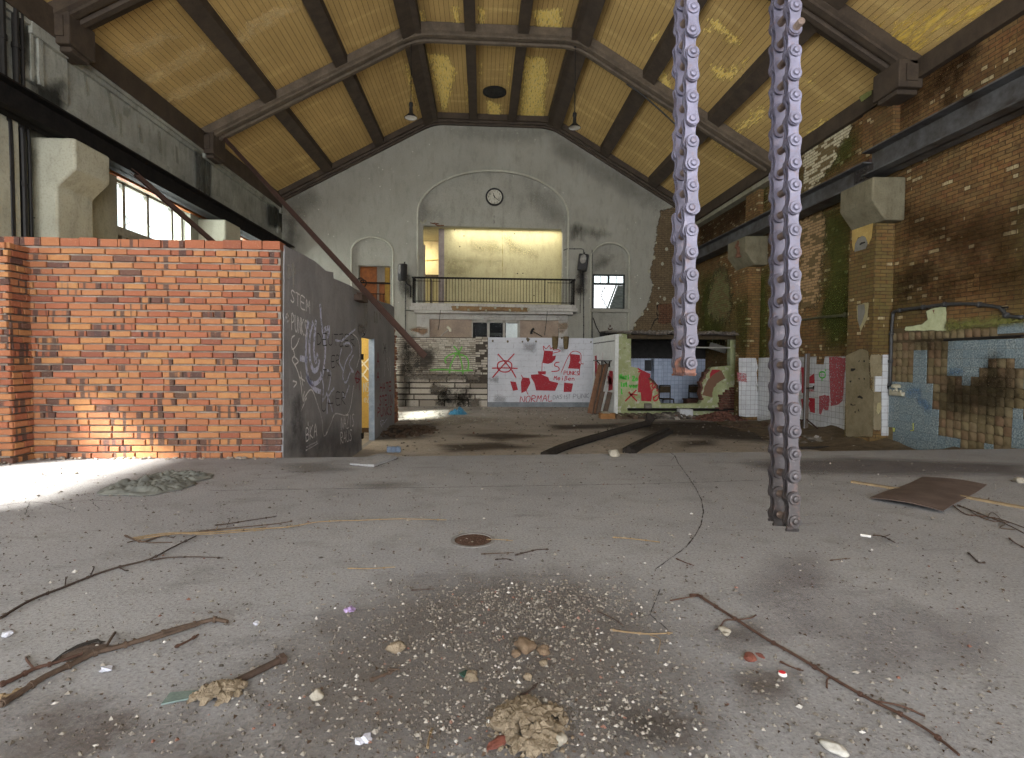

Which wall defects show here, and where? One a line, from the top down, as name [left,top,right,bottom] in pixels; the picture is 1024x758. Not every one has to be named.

peeling [633,207,675,331]
spalling [697,369,710,400]
spalling [715,385,735,412]
crack [641,453,704,630]